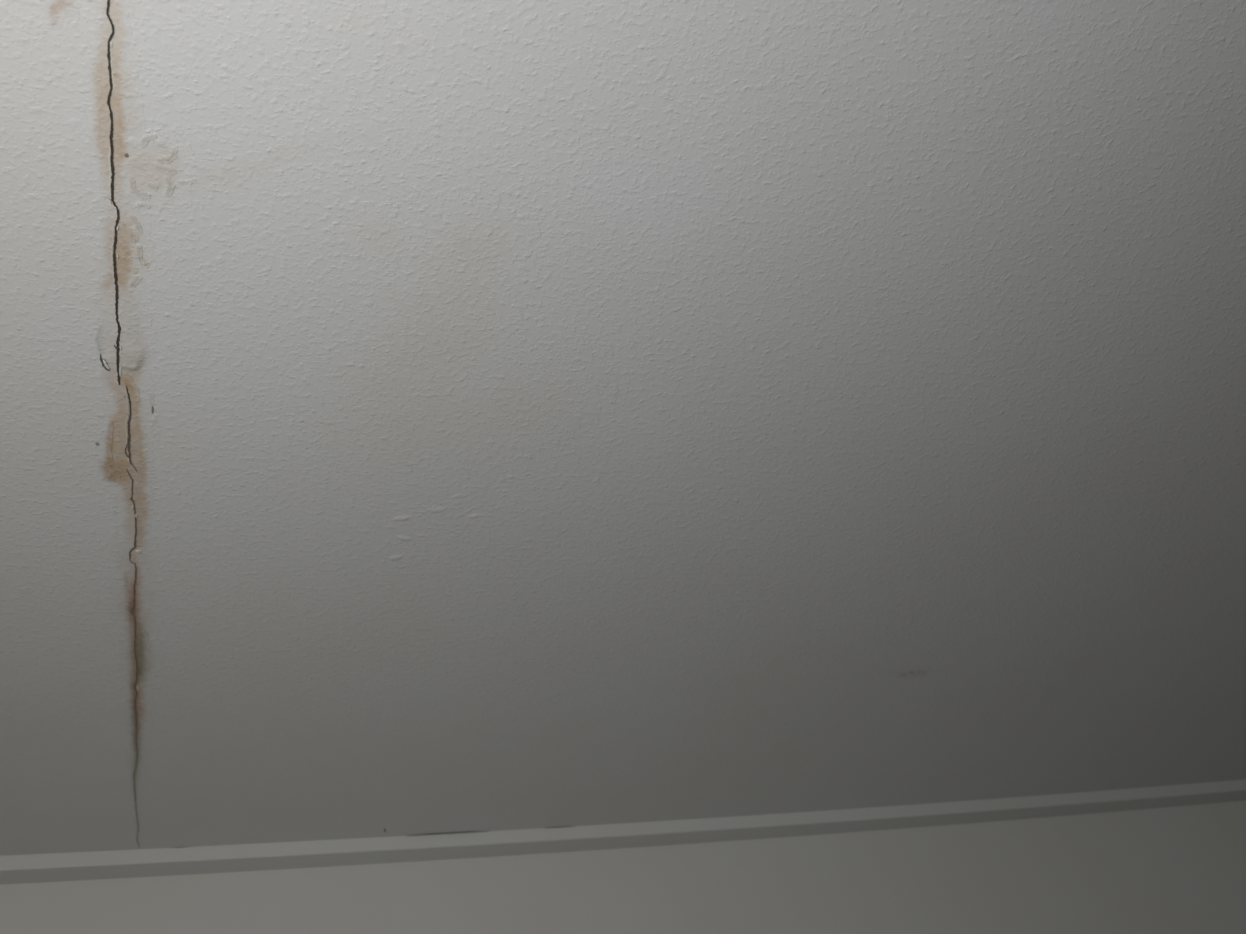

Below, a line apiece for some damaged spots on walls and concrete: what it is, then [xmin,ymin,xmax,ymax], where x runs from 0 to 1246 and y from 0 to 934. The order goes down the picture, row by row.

water stain [42,0,200,833]
crack [106,0,141,848]